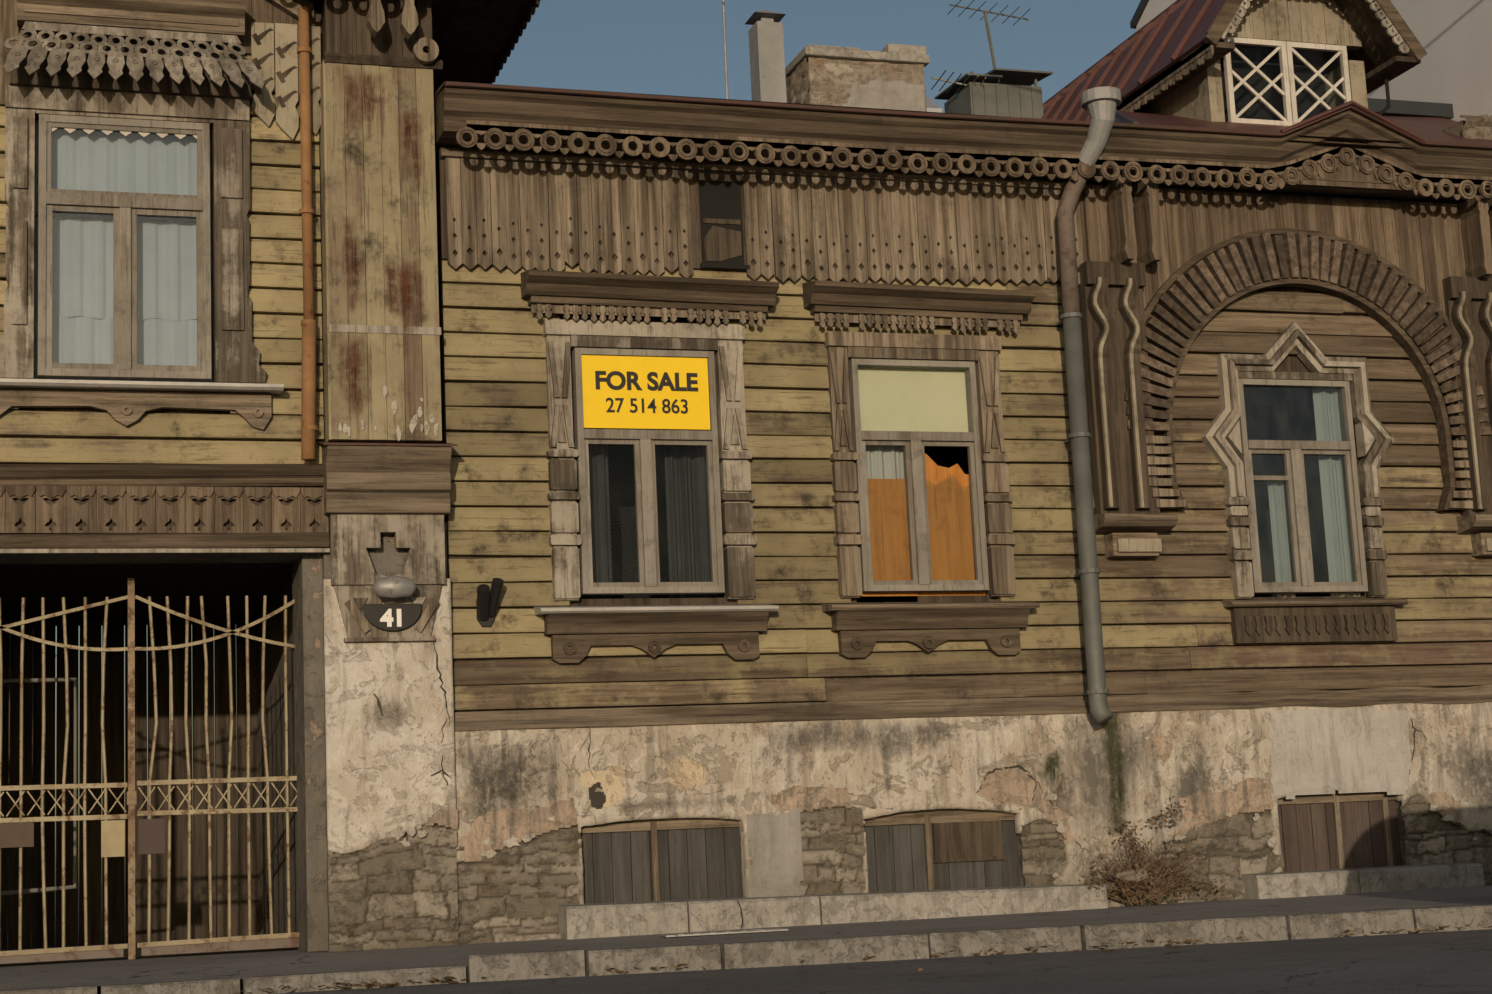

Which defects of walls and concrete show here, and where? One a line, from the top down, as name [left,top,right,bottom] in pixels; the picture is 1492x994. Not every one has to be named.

spalling [1460,115,1492,140]
crack [431,635,451,786]
spalling [328,765,626,952]
spalling [766,779,876,895]
peeling [977,766,1077,886]
spalling [1155,777,1284,903]
spalling [1400,787,1492,885]